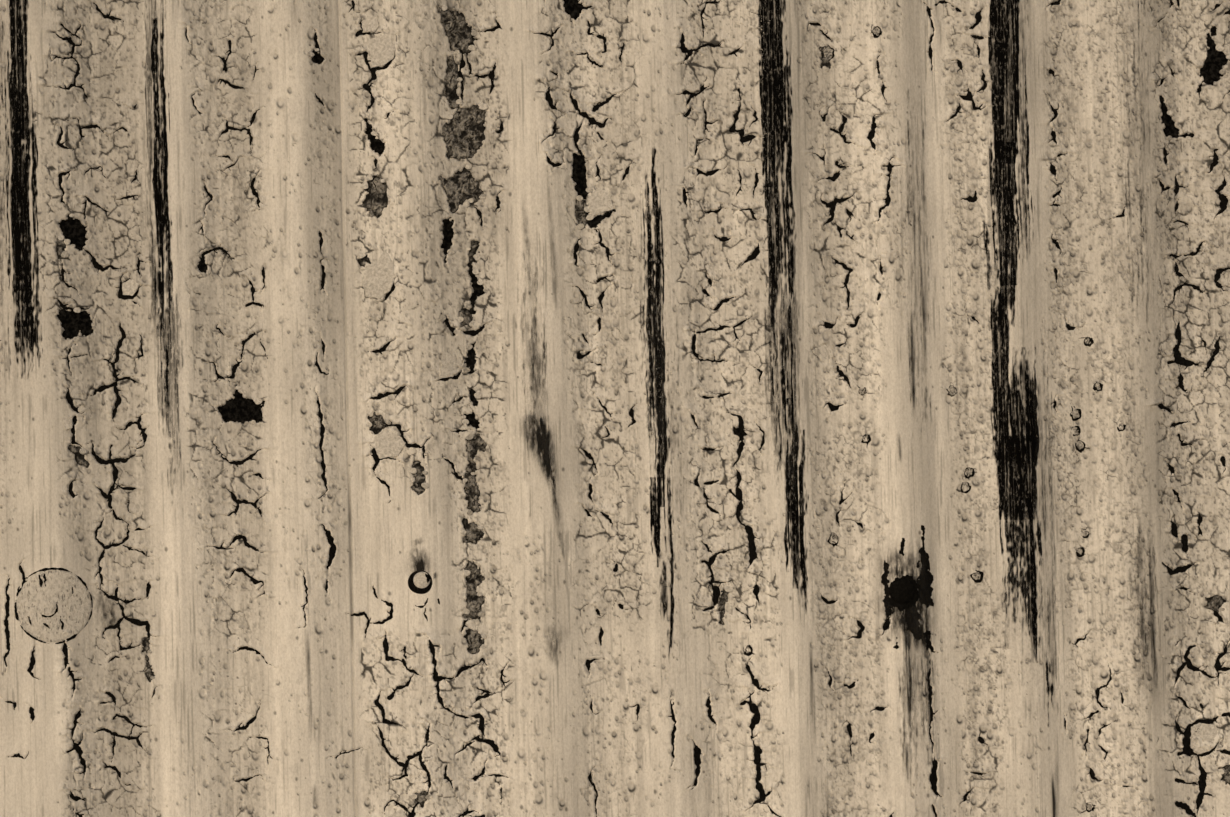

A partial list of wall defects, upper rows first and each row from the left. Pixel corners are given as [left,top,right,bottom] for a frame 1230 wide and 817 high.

peeling [53,214,88,264]
peeling [57,307,96,345]
crack [47,2,156,663]
peeling [213,384,265,425]
peeling [437,5,488,544]
crack [691,272,765,629]
crack [813,55,900,411]
crack [1152,147,1230,592]
crack [330,574,510,817]
peeling [462,560,487,654]
rust [885,551,930,717]
crack [1175,610,1230,817]